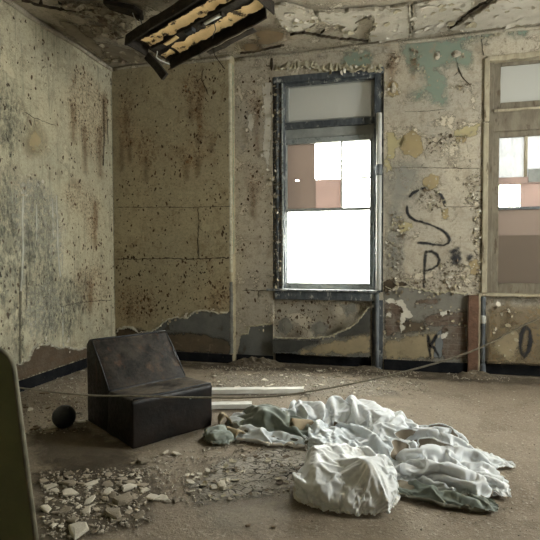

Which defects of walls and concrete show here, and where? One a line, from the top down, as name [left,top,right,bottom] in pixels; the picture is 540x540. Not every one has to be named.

peeling [274,0,540,105]
crack [449,0,489,29]
peeling [384,123,480,172]
flaking render [33,62,371,357]
flaking render [0,258,26,335]
flaking render [383,174,482,363]
flaking render [16,333,87,380]